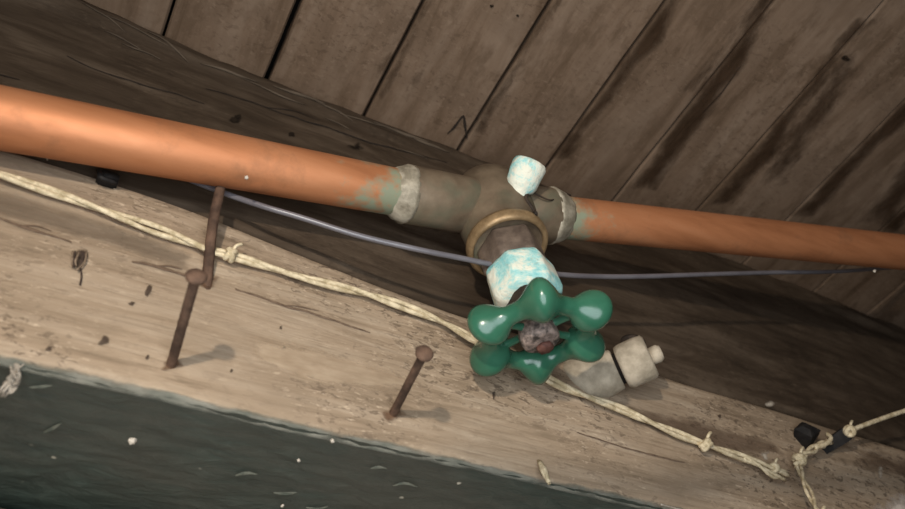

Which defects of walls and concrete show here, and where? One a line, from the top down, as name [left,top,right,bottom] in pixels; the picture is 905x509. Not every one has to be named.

leakage [561,11,668,155]
leakage [638,3,766,186]
leakage [716,57,845,202]
leakage [803,104,905,213]
leakage [876,170,905,230]